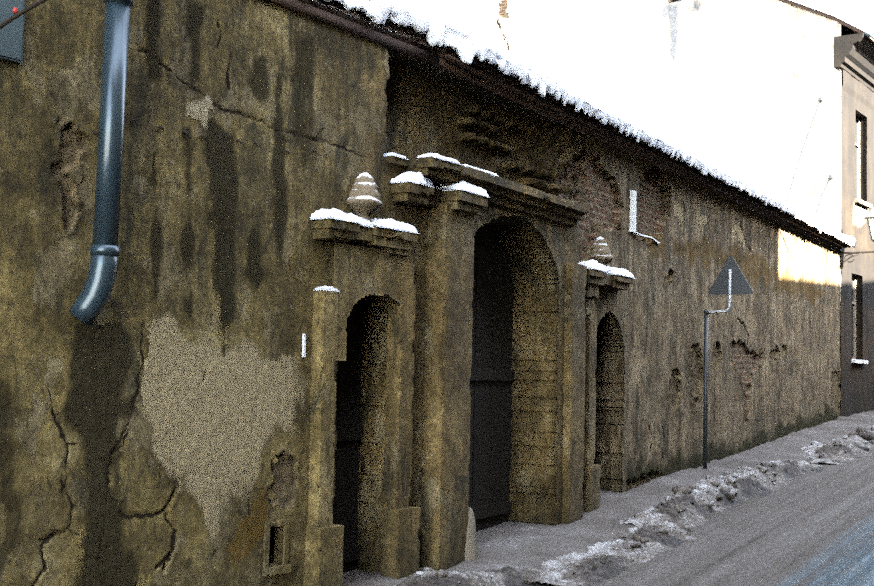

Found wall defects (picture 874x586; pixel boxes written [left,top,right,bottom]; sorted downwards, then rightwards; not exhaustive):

crack [138,21,357,155]
crack [496,18,510,53]
spalling [51,115,90,232]
crack [32,384,77,586]
crack [107,322,179,570]
spalling [667,339,788,424]